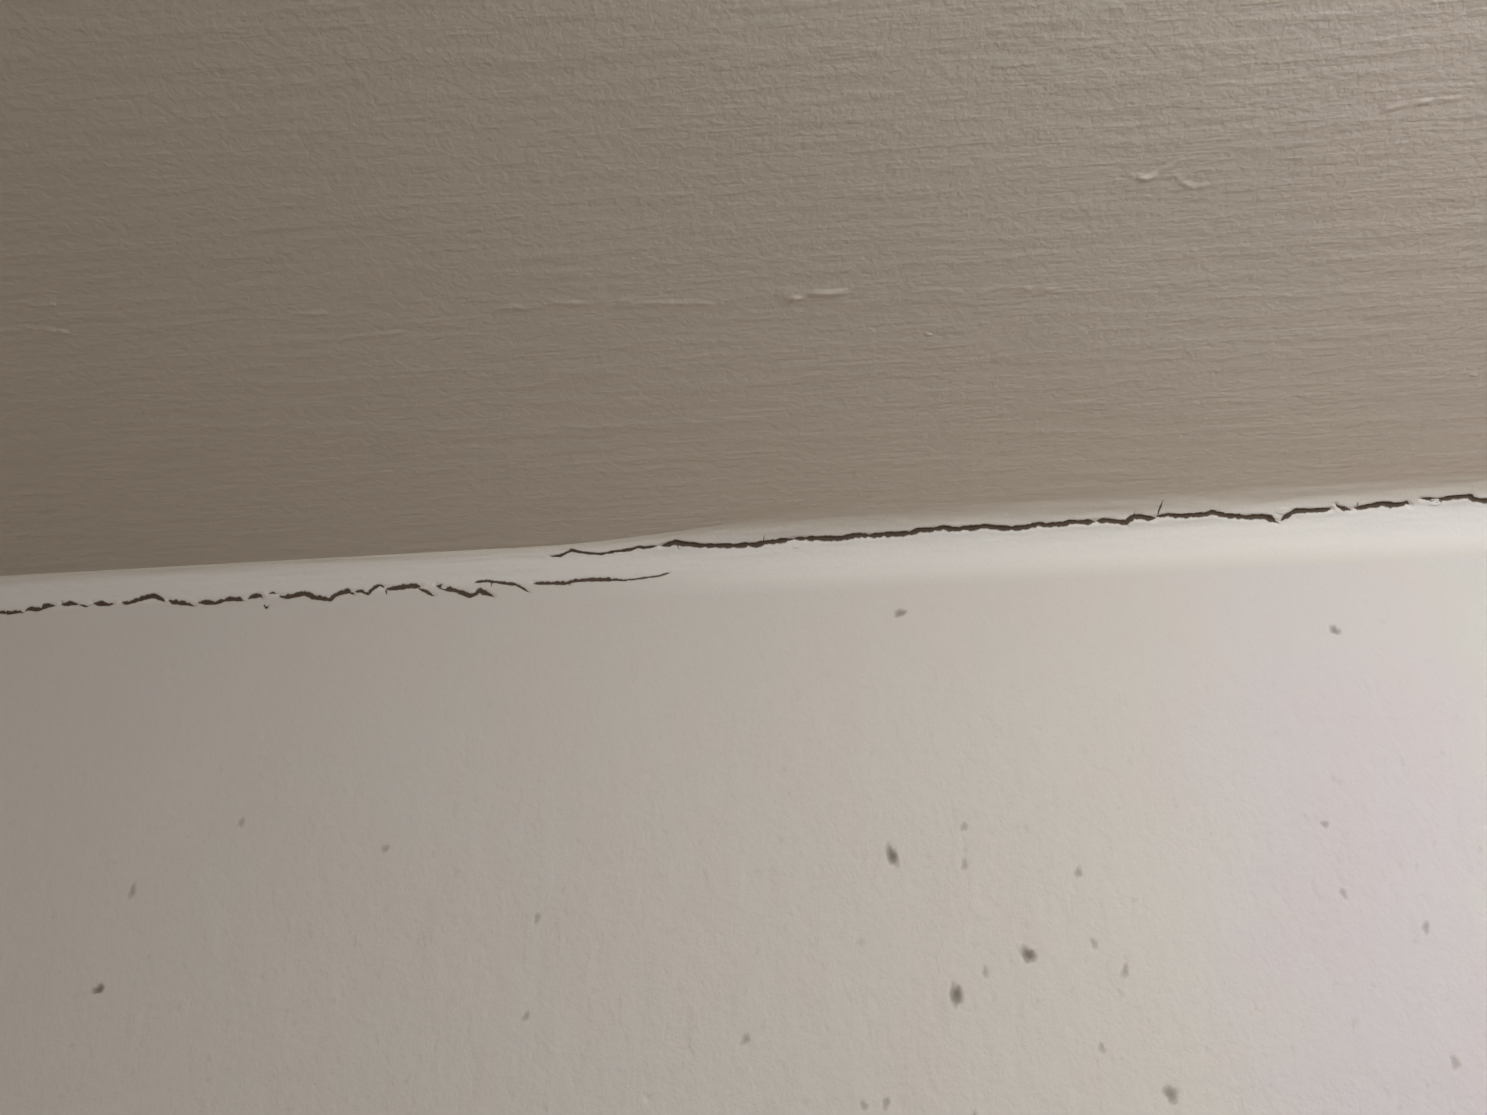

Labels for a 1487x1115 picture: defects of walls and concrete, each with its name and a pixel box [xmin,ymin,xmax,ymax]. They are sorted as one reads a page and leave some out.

crack [0,494,1487,615]